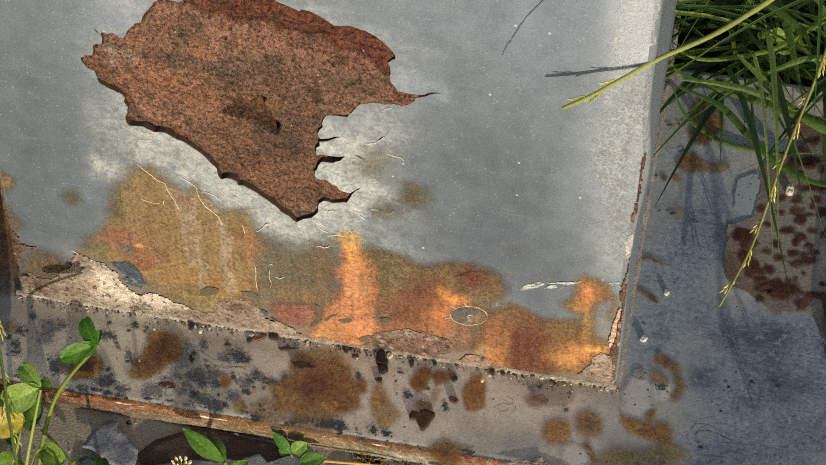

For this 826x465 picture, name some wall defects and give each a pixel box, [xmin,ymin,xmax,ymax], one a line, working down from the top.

peeling [21,254,302,366]
corrosion [41,165,627,465]
corrosion [637,288,659,303]
corrosion [652,353,685,401]
corrosion [544,409,687,465]